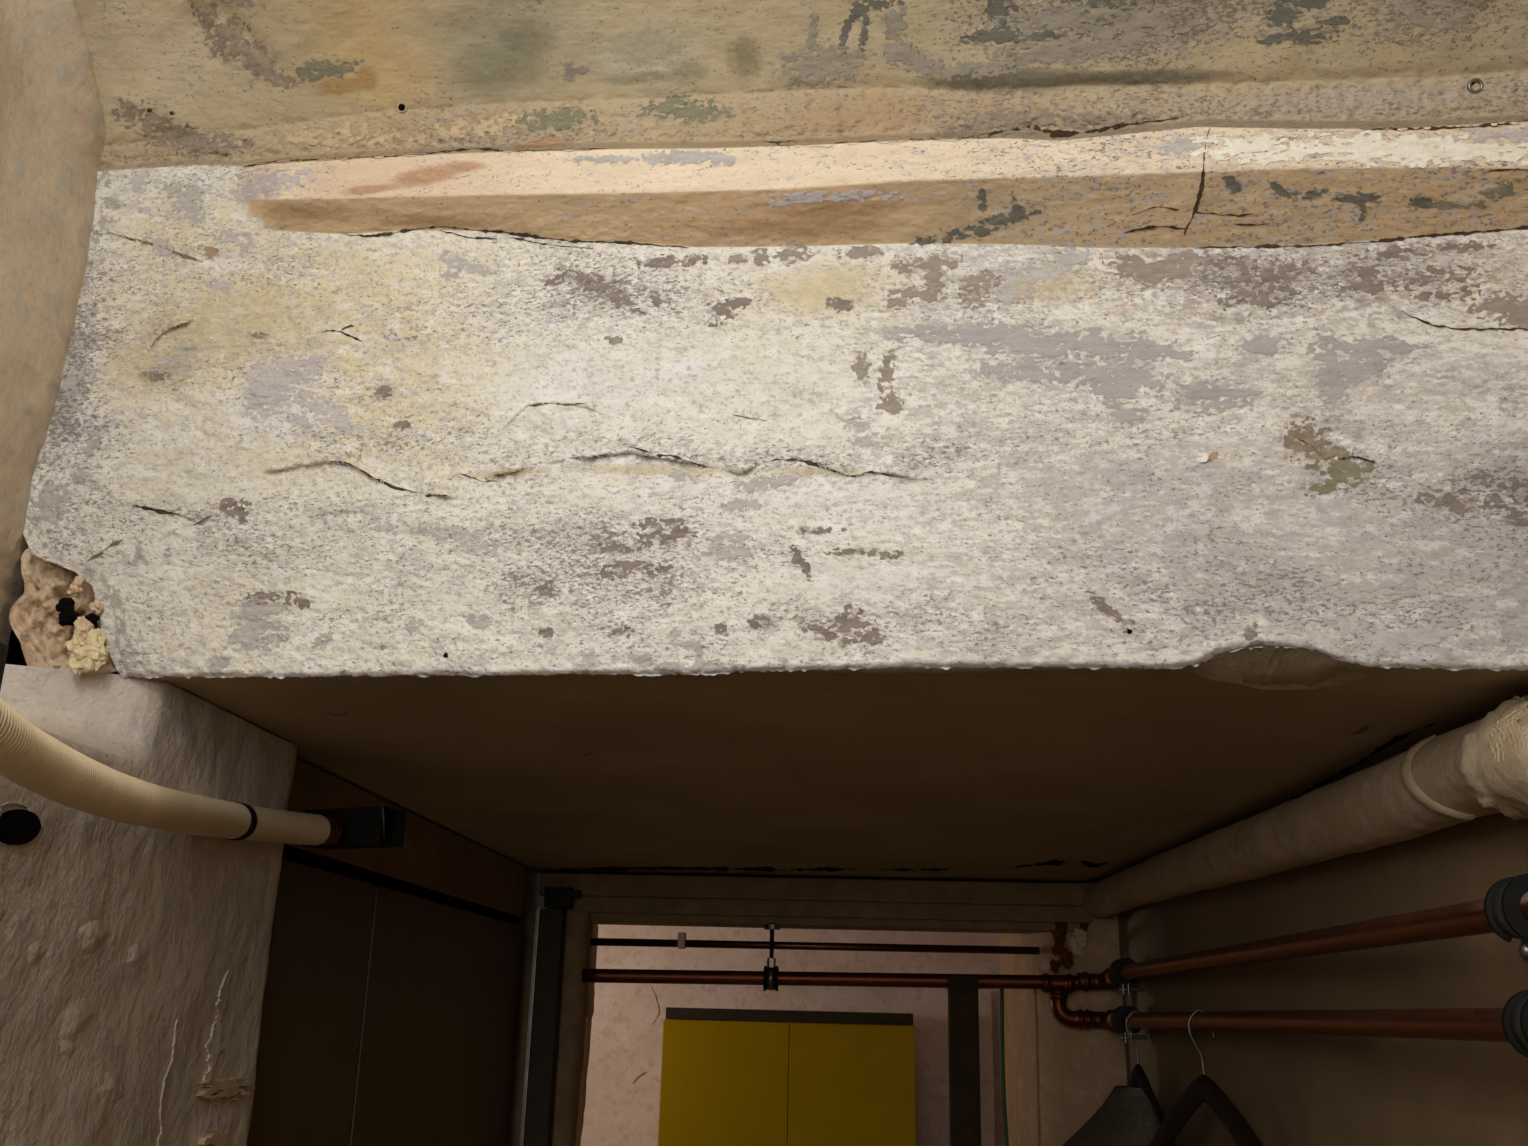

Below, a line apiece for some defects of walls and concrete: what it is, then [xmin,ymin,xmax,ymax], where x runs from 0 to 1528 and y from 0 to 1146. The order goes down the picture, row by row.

water stain [942,70,1205,89]
crack [1403,311,1528,331]
crack [529,401,584,409]
crack [571,446,712,468]
crack [764,458,890,477]
crack [329,461,495,497]
spalling [9,548,117,674]